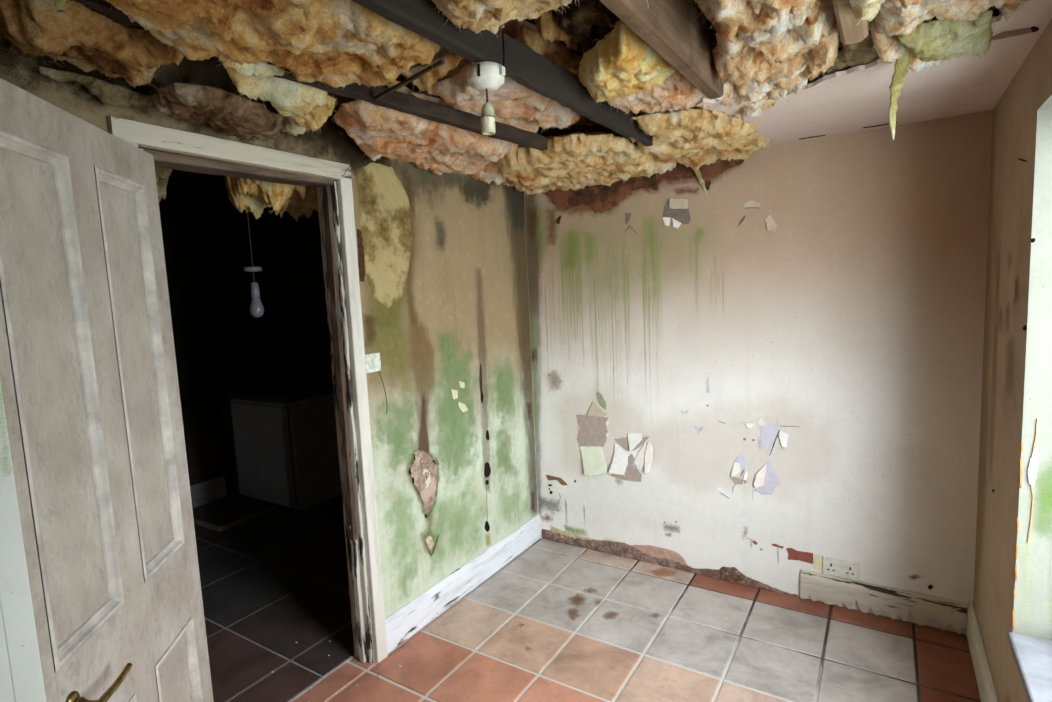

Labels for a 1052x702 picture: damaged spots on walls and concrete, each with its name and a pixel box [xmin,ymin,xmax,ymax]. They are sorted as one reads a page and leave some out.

peeling [991,26,1039,41]
peeling [544,159,744,228]
peeling [738,200,777,232]
peeling [352,156,422,347]
damp [361,160,853,610]
flaking render [406,448,440,556]
peeling [546,402,652,494]
peeling [731,462,766,488]
peeling [779,430,788,447]
flaking render [541,525,798,596]
flaking render [786,548,823,573]